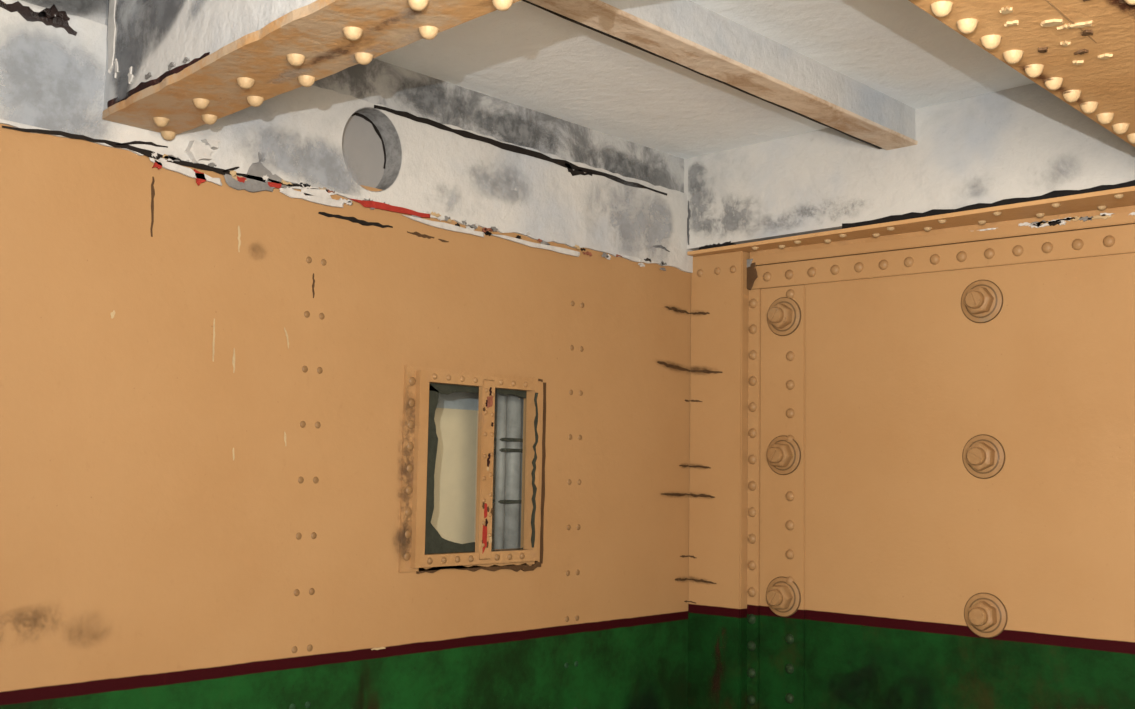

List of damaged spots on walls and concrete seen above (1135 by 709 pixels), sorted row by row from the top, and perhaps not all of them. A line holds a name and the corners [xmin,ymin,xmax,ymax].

crack [0,0,77,36]
corrosion [1109,0,1135,10]
crack [374,105,691,252]
peeling [150,152,622,260]
leakage [688,165,748,231]
crack [666,306,710,315]
crack [657,361,722,374]
crack [661,465,715,498]